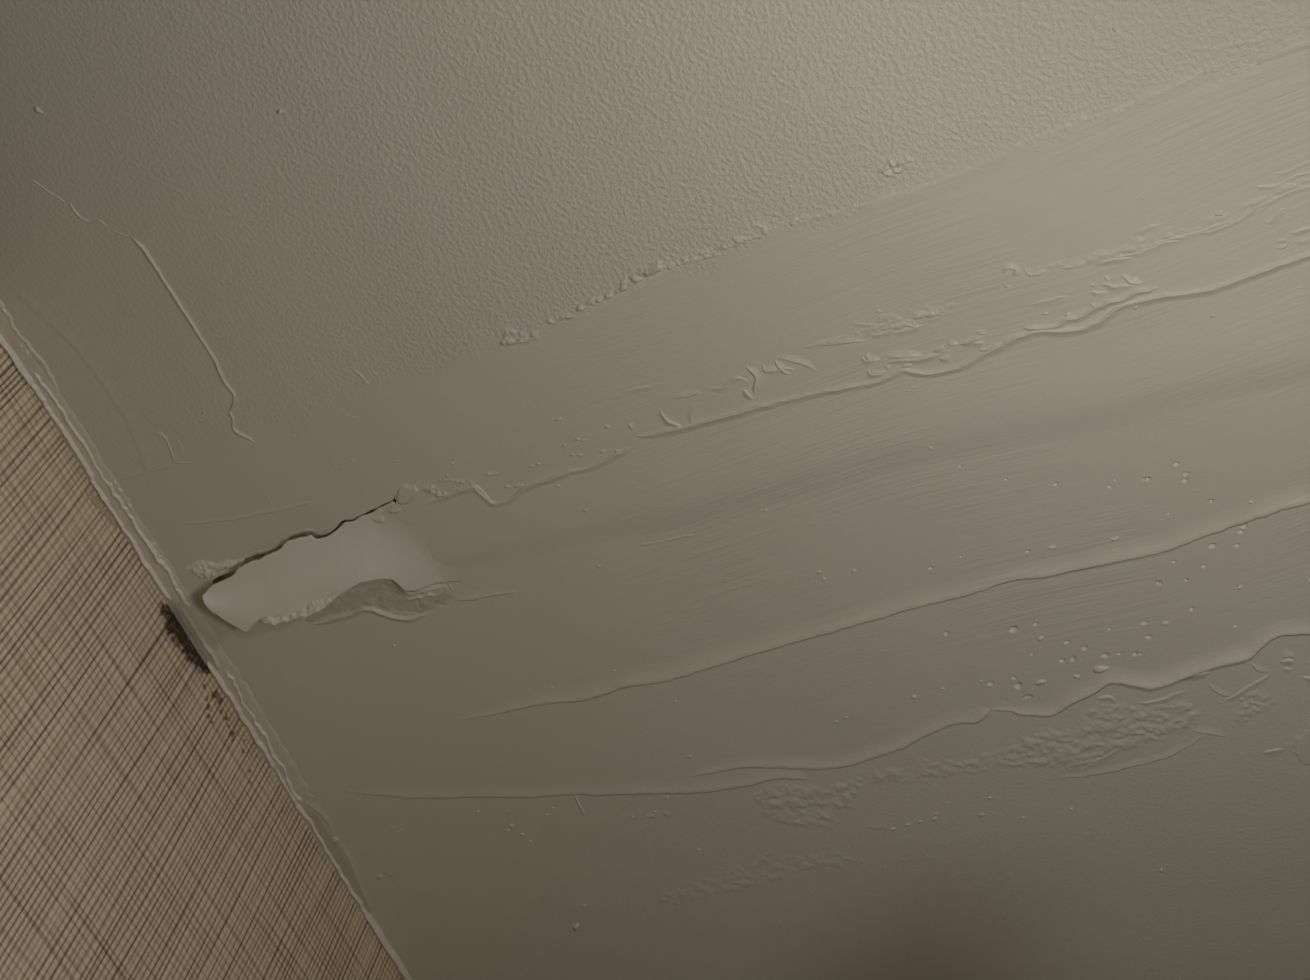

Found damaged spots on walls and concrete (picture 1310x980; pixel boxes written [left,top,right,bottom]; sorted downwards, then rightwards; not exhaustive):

crack [29,178,255,443]
peeling [185,484,525,633]
damp [160,603,257,772]